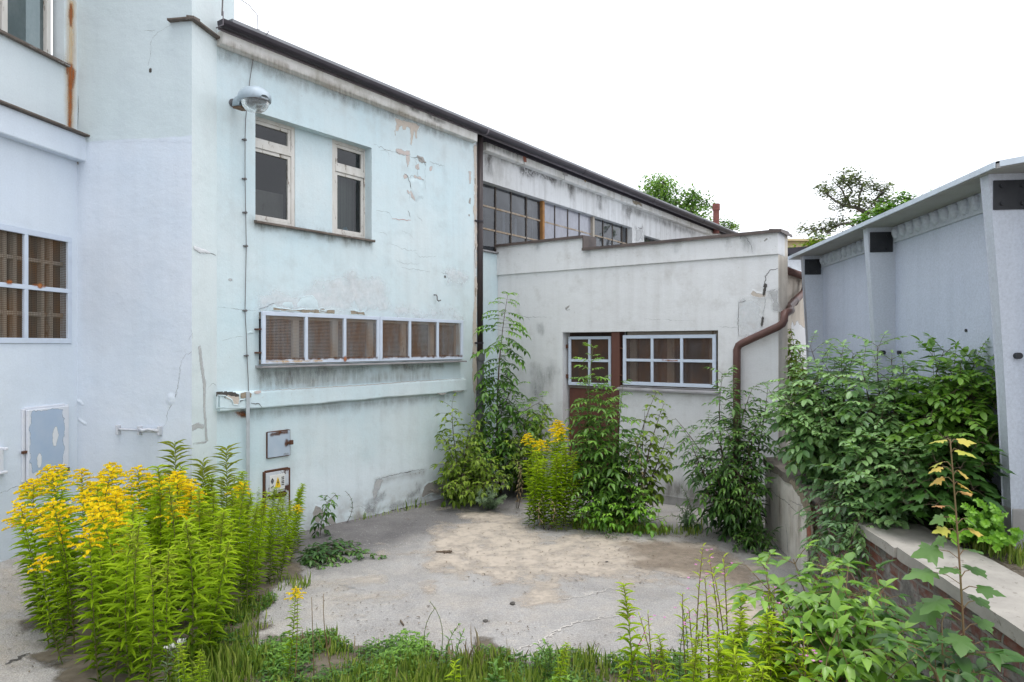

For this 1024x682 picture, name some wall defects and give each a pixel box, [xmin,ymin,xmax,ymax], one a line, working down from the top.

rust [67,2,75,127]
peeling [374,108,442,202]
flaking render [216,390,262,409]
crack [515,615,620,652]